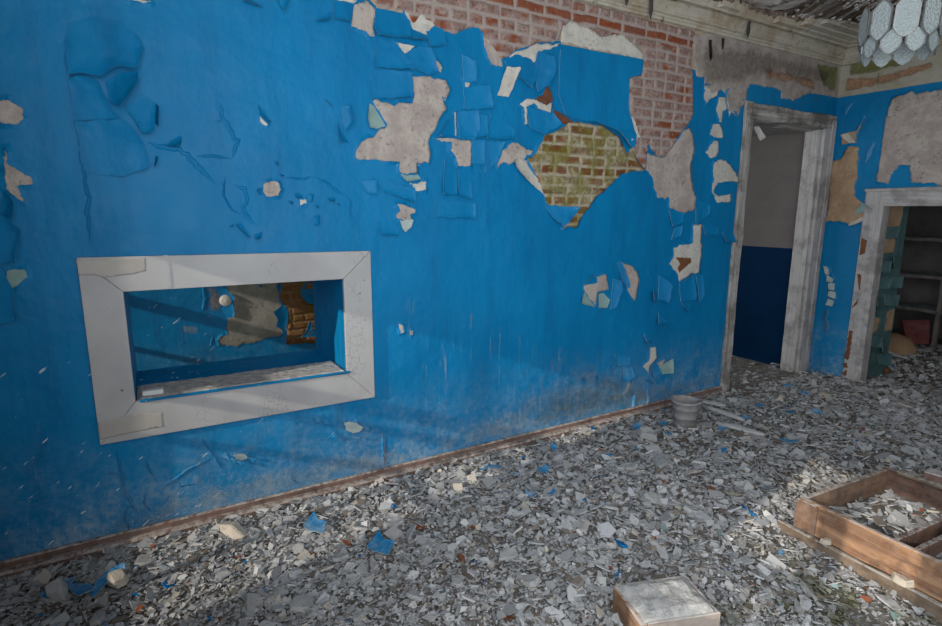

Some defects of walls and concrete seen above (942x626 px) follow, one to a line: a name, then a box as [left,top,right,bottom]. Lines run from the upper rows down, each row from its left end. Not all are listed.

flaking render [0,94,31,130]
peeling [256,105,272,129]
peeling [257,161,320,226]
flaking render [315,0,840,325]
flaking render [825,87,942,228]
peeling [0,143,40,324]
flaking render [215,281,316,348]
peeling [396,321,415,338]
flaking render [614,334,674,397]
peeling [842,330,853,379]
peeling [871,206,905,366]